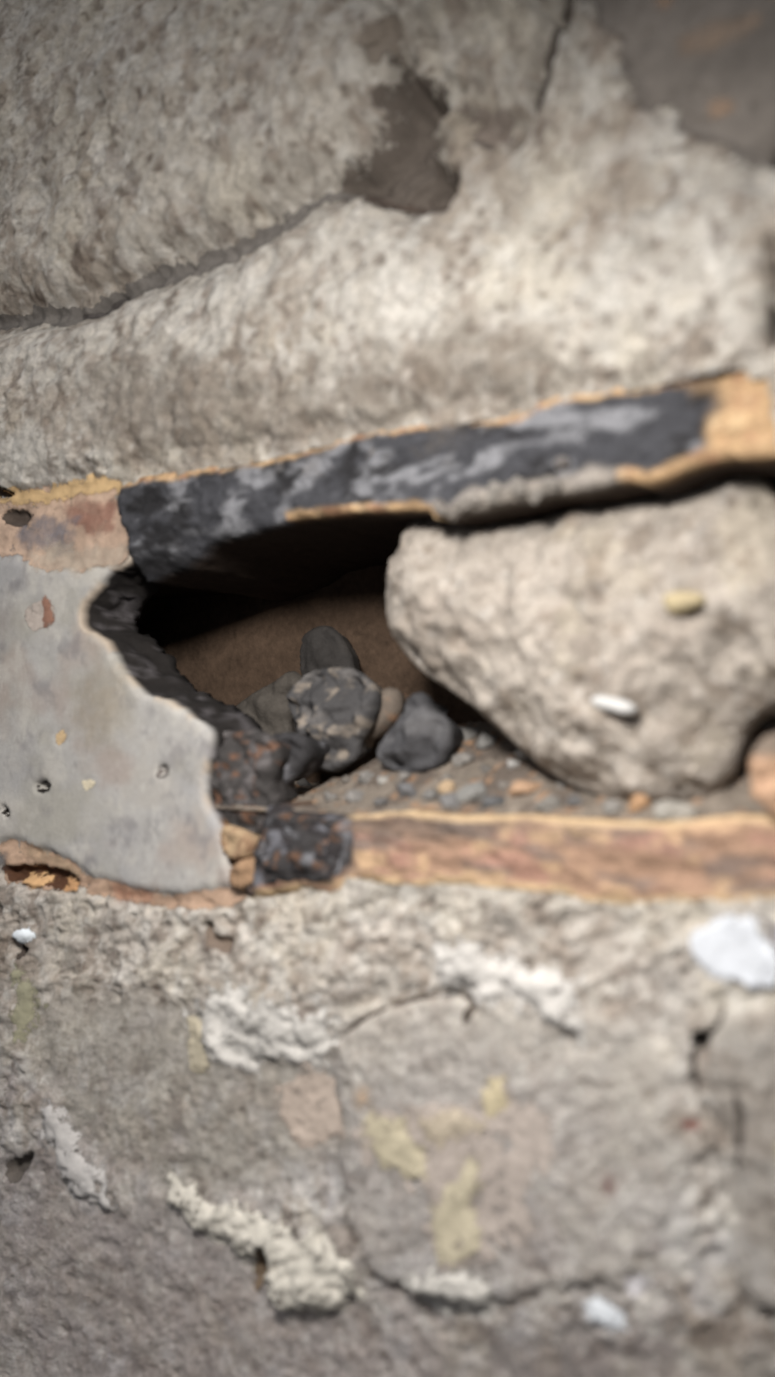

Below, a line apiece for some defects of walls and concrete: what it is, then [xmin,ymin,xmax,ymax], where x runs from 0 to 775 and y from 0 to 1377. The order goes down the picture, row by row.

crack [517,0,574,151]
spalling [0,473,129,574]
spalling [24,595,55,632]
spalling [749,733,775,816]